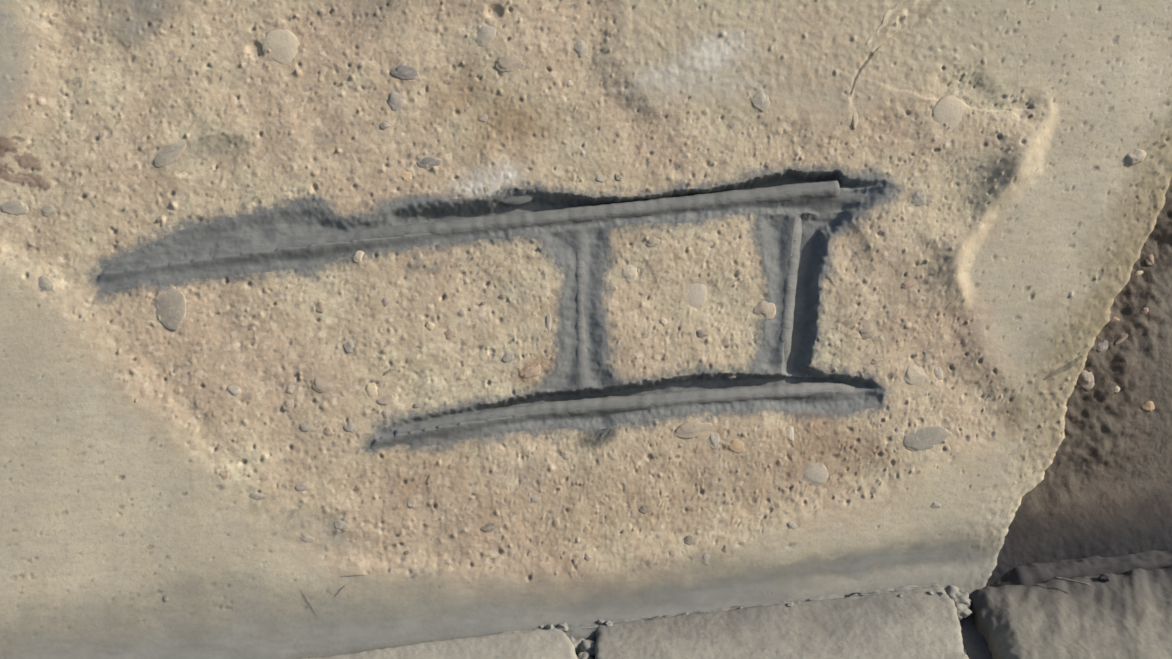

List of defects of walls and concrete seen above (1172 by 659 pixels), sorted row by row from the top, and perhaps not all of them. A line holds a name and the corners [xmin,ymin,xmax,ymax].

crack [840,0,938,122]
spalling [0,0,1038,584]
spalling [1044,355,1082,380]